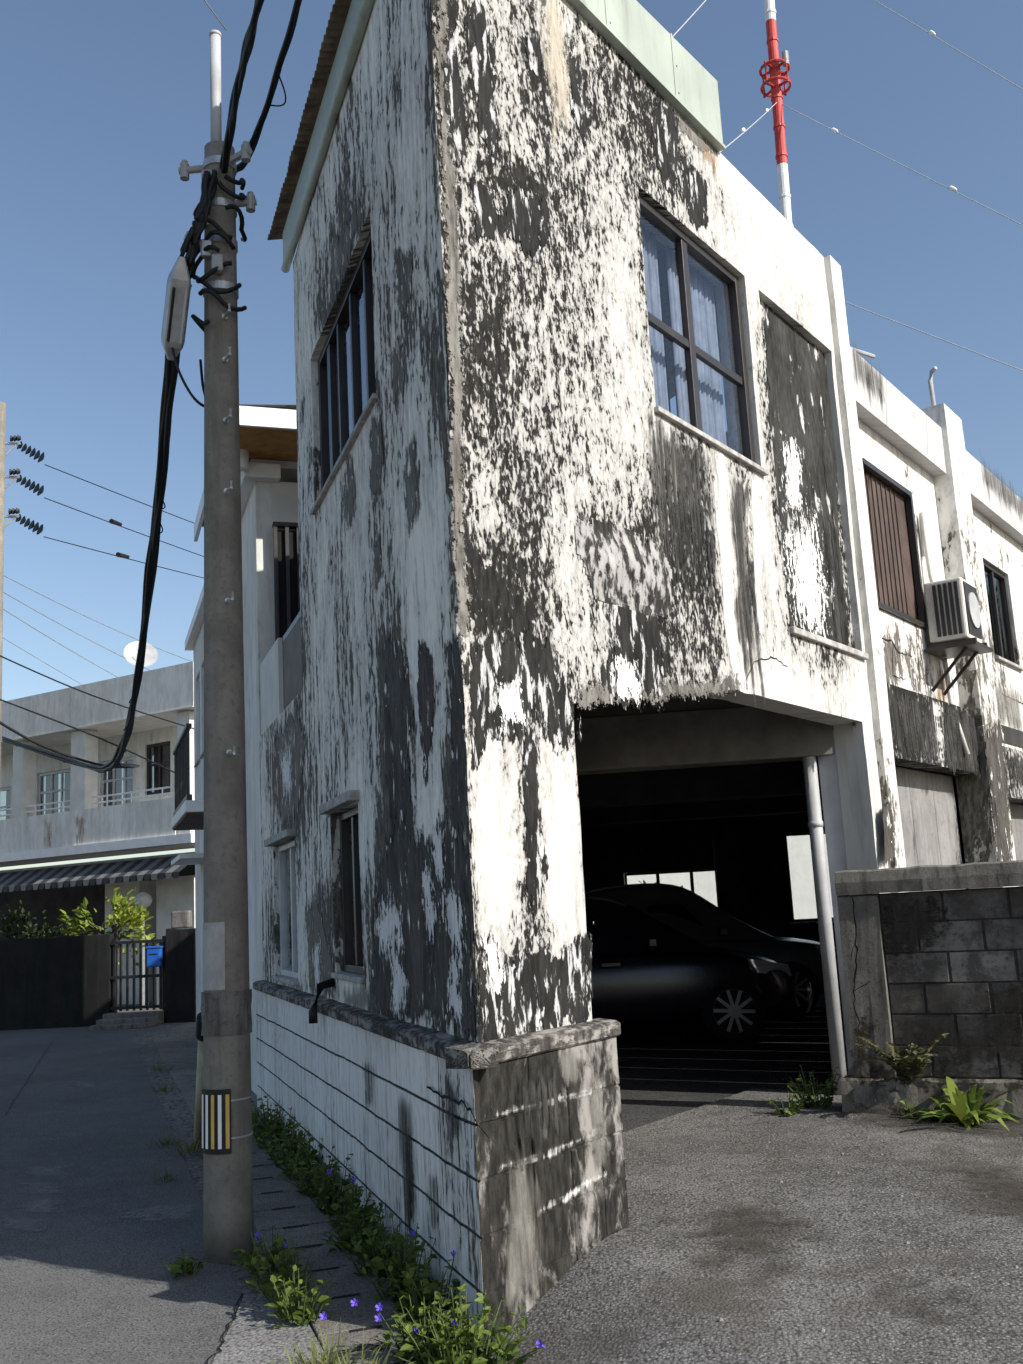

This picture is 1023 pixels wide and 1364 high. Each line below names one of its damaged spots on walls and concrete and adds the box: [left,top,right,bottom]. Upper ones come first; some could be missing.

damp [544,0,569,136]
damp [764,304,850,646]
damp [648,415,765,704]
damp [886,682,981,779]
damp [996,687,1022,729]
damp [1005,753,1023,785]
damp [878,893,957,968]
damp [497,1051,607,1305]